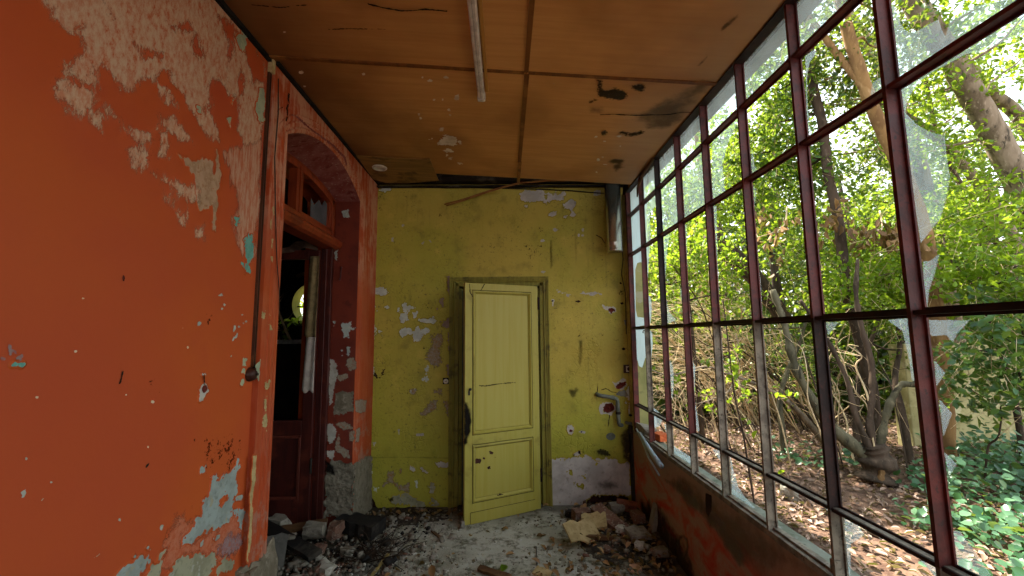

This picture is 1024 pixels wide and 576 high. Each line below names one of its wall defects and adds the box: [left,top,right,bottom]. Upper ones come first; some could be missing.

crack [329,3,447,30]
peeling [43,0,275,277]
damp [590,80,645,103]
damp [620,85,705,137]
peeling [519,188,577,257]
peeling [328,320,357,406]
peeling [374,275,451,416]
peeling [114,437,257,576]
spalling [323,421,448,518]
peeling [552,450,631,505]